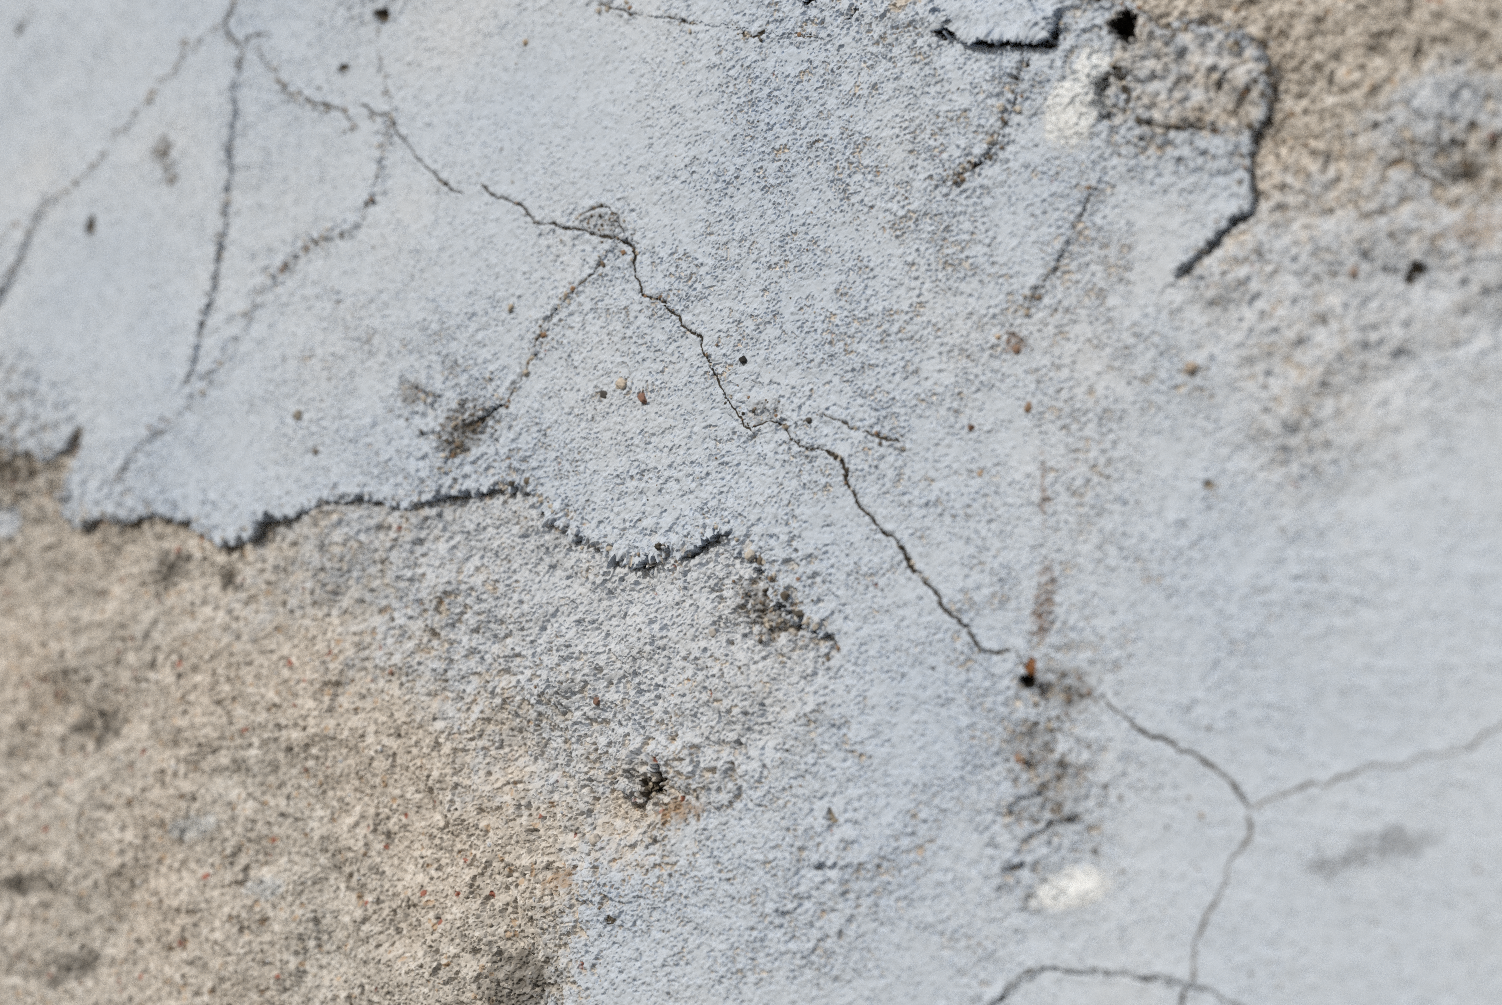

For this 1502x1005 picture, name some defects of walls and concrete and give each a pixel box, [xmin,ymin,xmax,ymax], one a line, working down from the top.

hole [374,7,390,25]
crack [931,21,1063,187]
crack [1109,57,1260,142]
spalling [85,216,96,236]
crack [1022,181,1101,316]
flaking render [891,0,1502,501]
crack [0,0,1026,672]
flaking render [0,426,840,1005]
spalling [1018,673,1037,692]
crack [611,766,668,802]
crack [993,687,1502,1005]
peeling [1000,969,1224,1005]